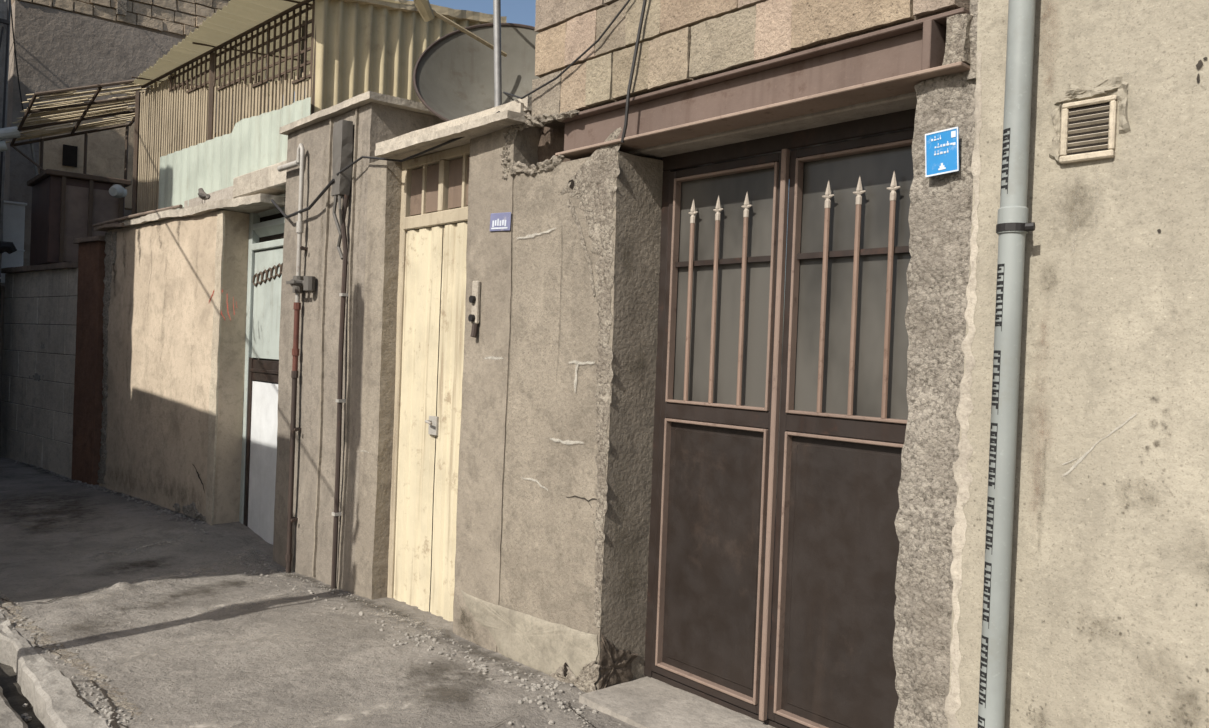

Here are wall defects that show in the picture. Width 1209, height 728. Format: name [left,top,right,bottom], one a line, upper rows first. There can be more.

spalling [500,110,580,179]
spalling [548,127,638,693]
crack [72,680,129,728]